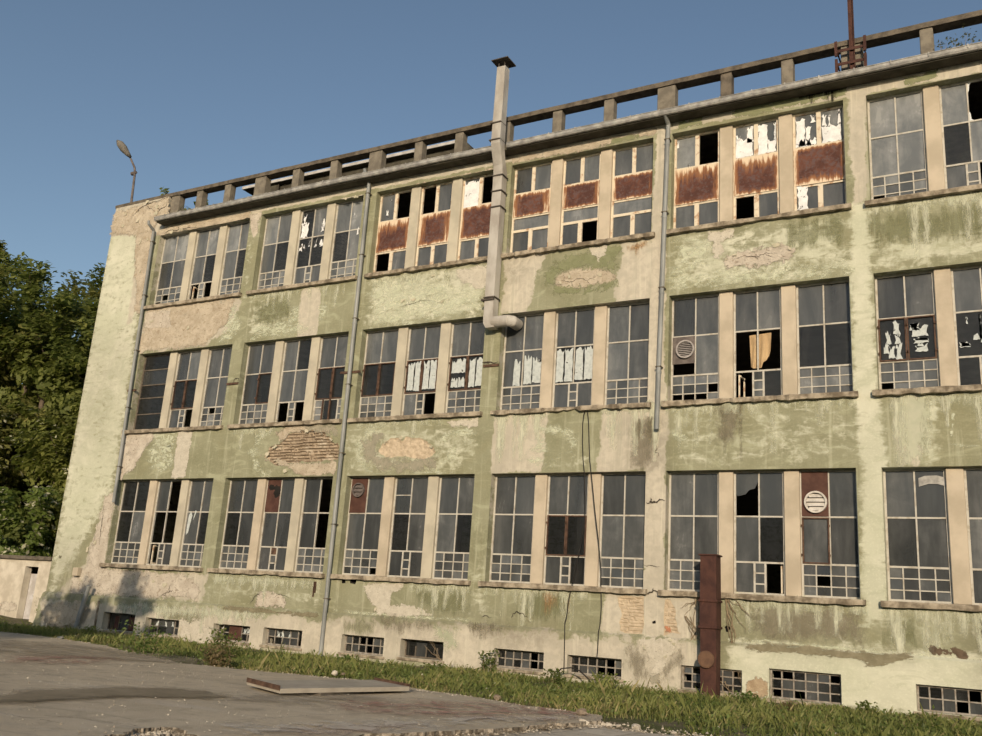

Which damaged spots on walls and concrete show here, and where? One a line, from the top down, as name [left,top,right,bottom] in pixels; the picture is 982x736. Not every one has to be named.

water stain [870,192,982,247]
peeling [110,197,262,354]
peeling [555,245,617,289]
peeling [707,228,796,270]
spalling [260,424,340,476]
spalling [378,436,435,460]
water stain [601,398,854,466]
peeling [70,493,200,602]
spalling [618,595,680,684]